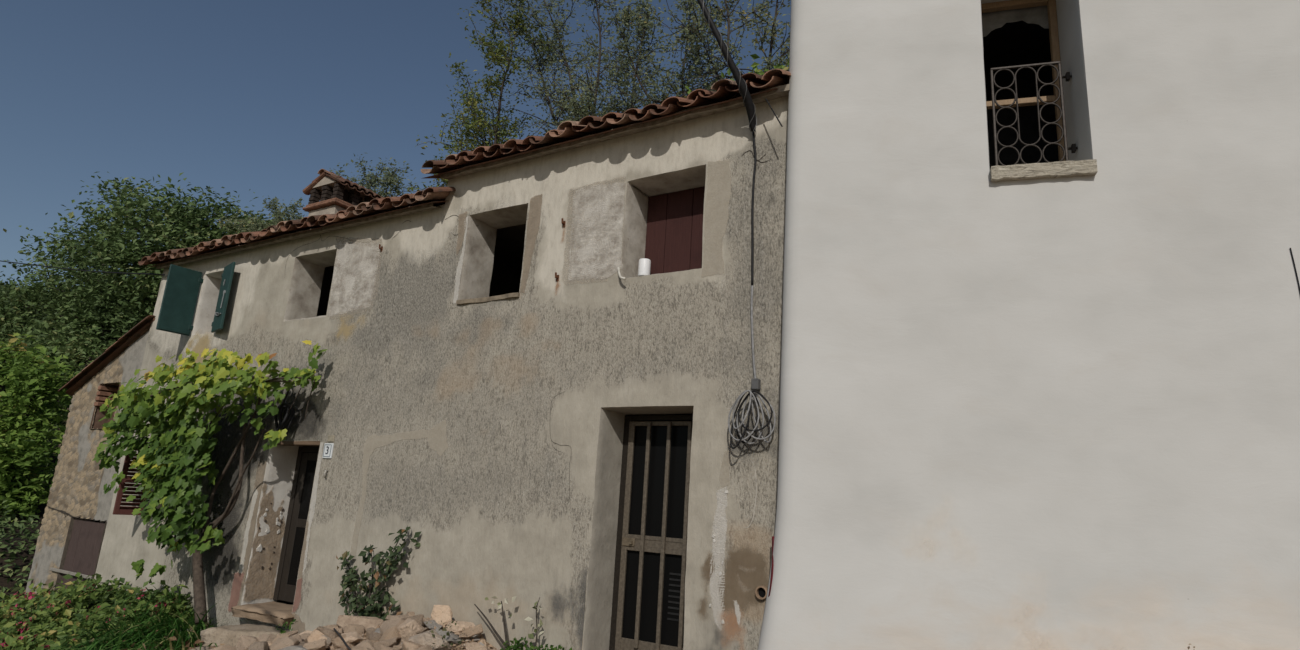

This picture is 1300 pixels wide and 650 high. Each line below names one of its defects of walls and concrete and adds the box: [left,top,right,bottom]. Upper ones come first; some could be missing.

peeling [228,461,285,612]
peeling [709,450,731,630]
leakage [699,547,769,624]